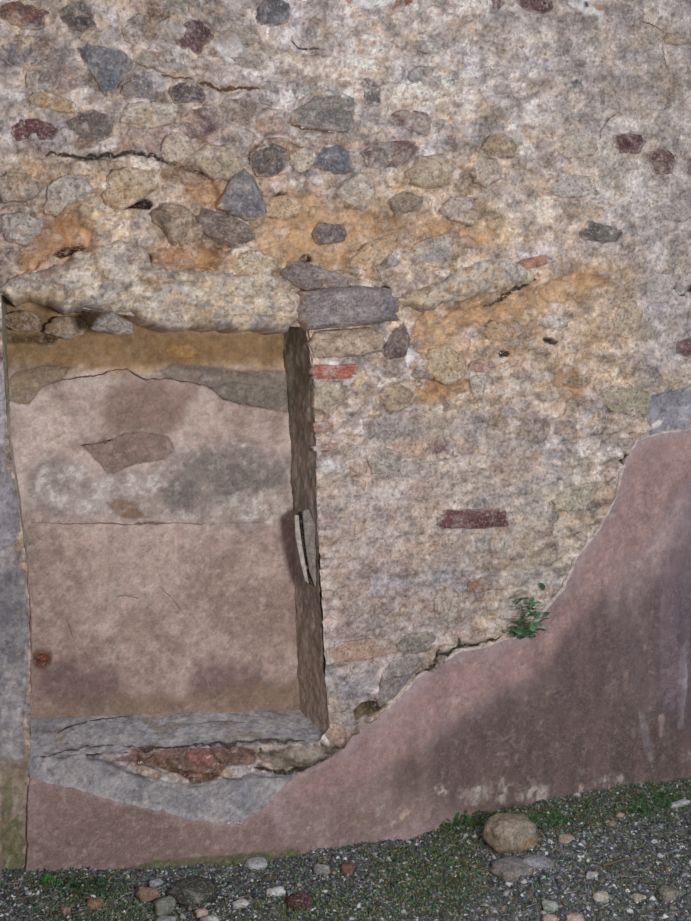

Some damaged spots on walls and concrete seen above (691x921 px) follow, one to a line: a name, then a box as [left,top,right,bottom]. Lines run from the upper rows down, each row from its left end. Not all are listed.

crack [46,150,206,177]
spalling [639,386,691,439]
crack [33,519,262,527]
spalling [0,363,343,825]
water stain [406,575,691,810]